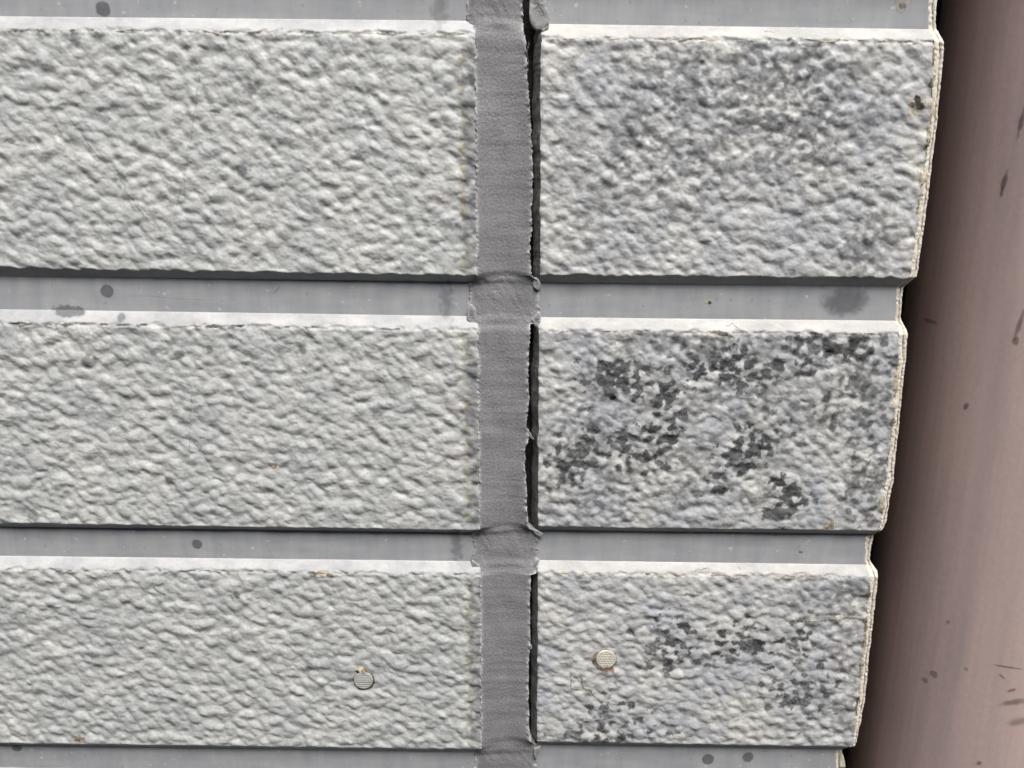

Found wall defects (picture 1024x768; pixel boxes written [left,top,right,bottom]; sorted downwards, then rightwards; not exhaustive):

crack [522,0,536,275]
damp [543,332,898,530]
damp [577,691,642,743]
damp [627,610,846,720]